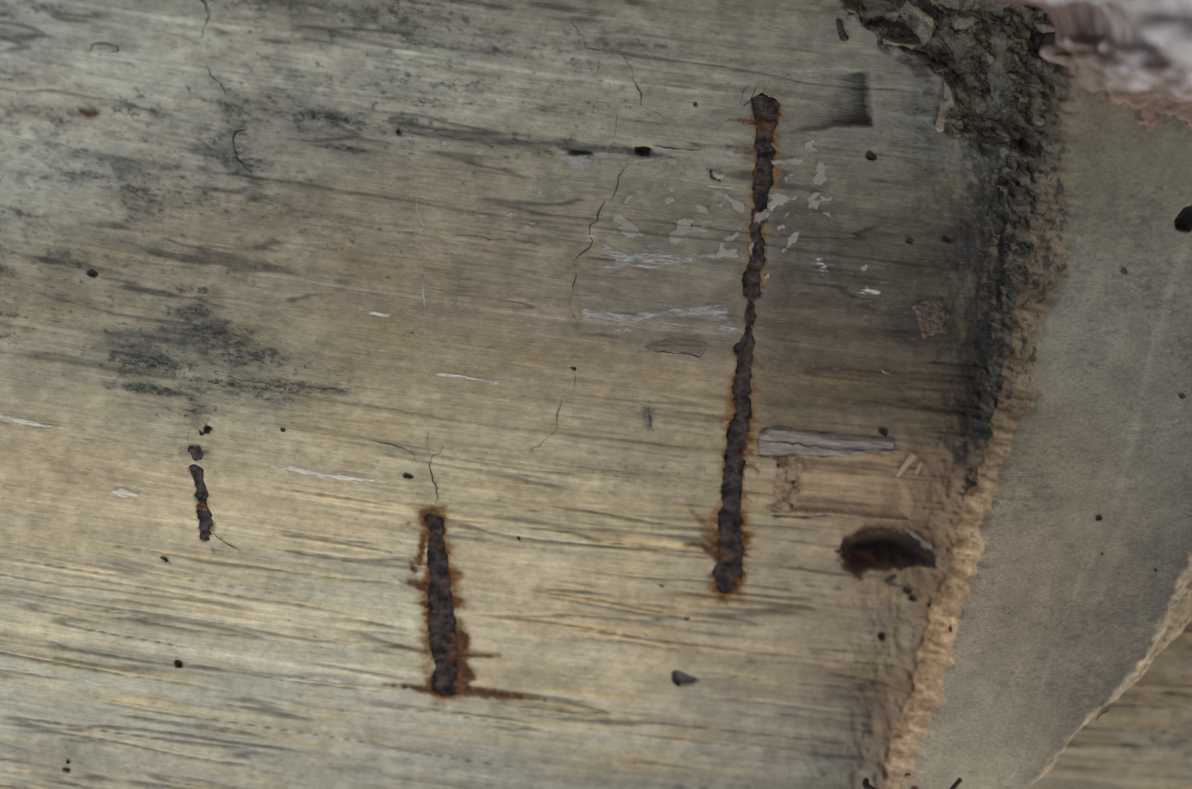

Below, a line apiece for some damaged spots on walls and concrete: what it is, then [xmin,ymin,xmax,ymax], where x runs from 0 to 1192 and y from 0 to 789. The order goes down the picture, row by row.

rust [684,95,782,602]
rust [188,445,213,541]
rust [383,506,547,705]